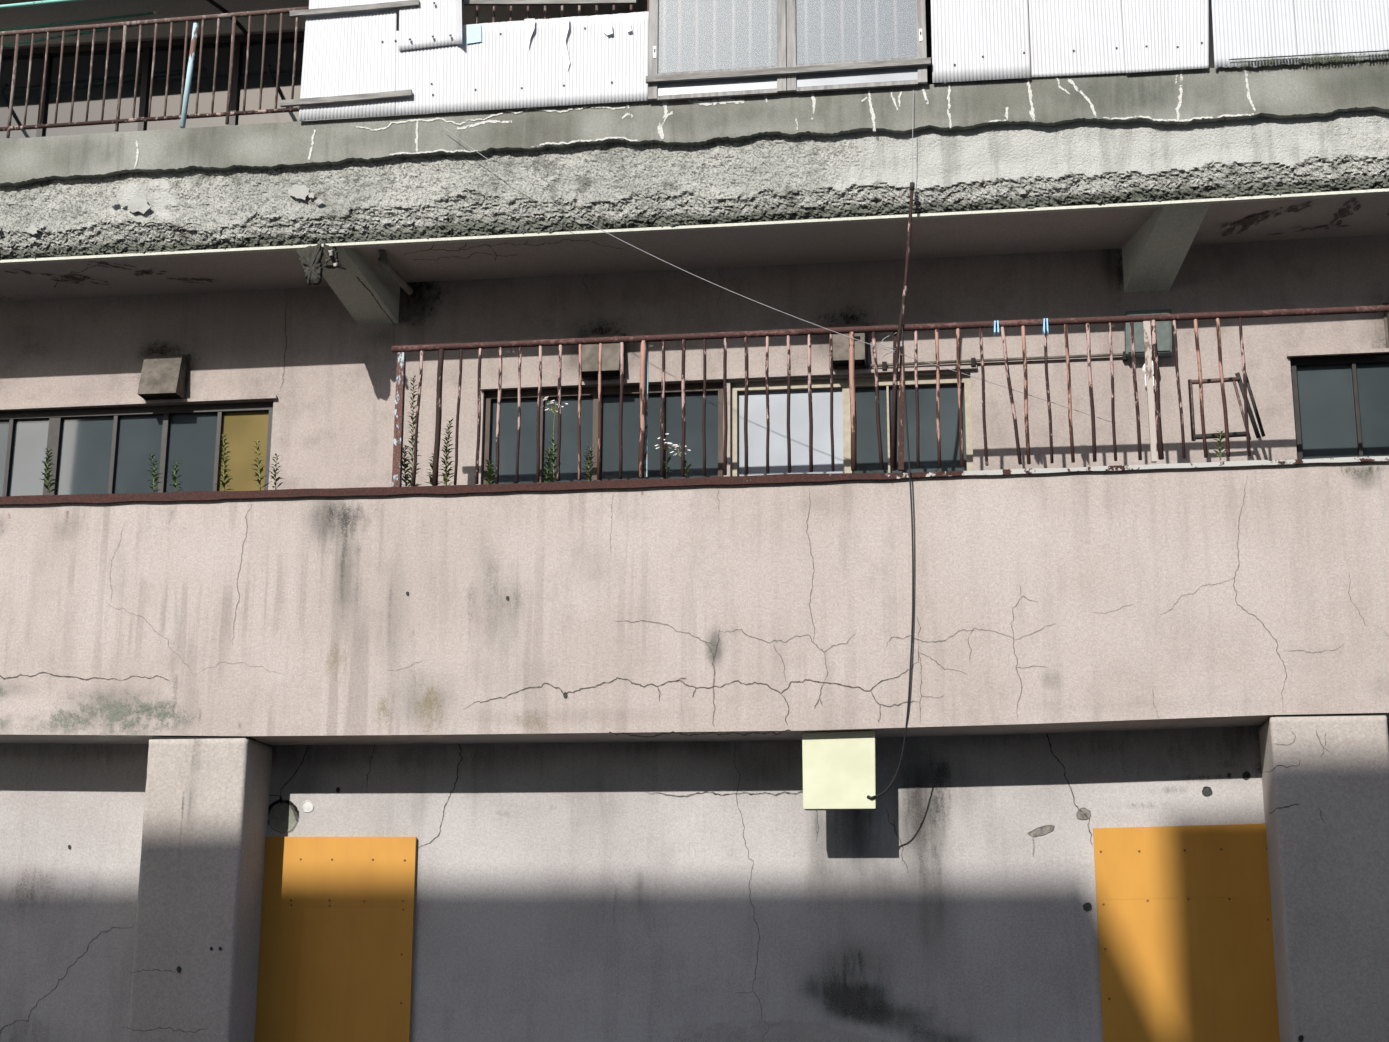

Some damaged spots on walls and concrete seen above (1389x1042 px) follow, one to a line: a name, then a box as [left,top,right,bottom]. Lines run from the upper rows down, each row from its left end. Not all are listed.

peeling [26,222,45,241]
peeling [109,197,151,214]
peeling [288,184,324,204]
crack [0,672,170,681]
water stain [50,696,173,729]
crack [1162,483,1389,773]
crack [418,744,463,848]
crack [464,496,1056,1042]
crack [1046,734,1093,846]
crack [0,927,120,1033]